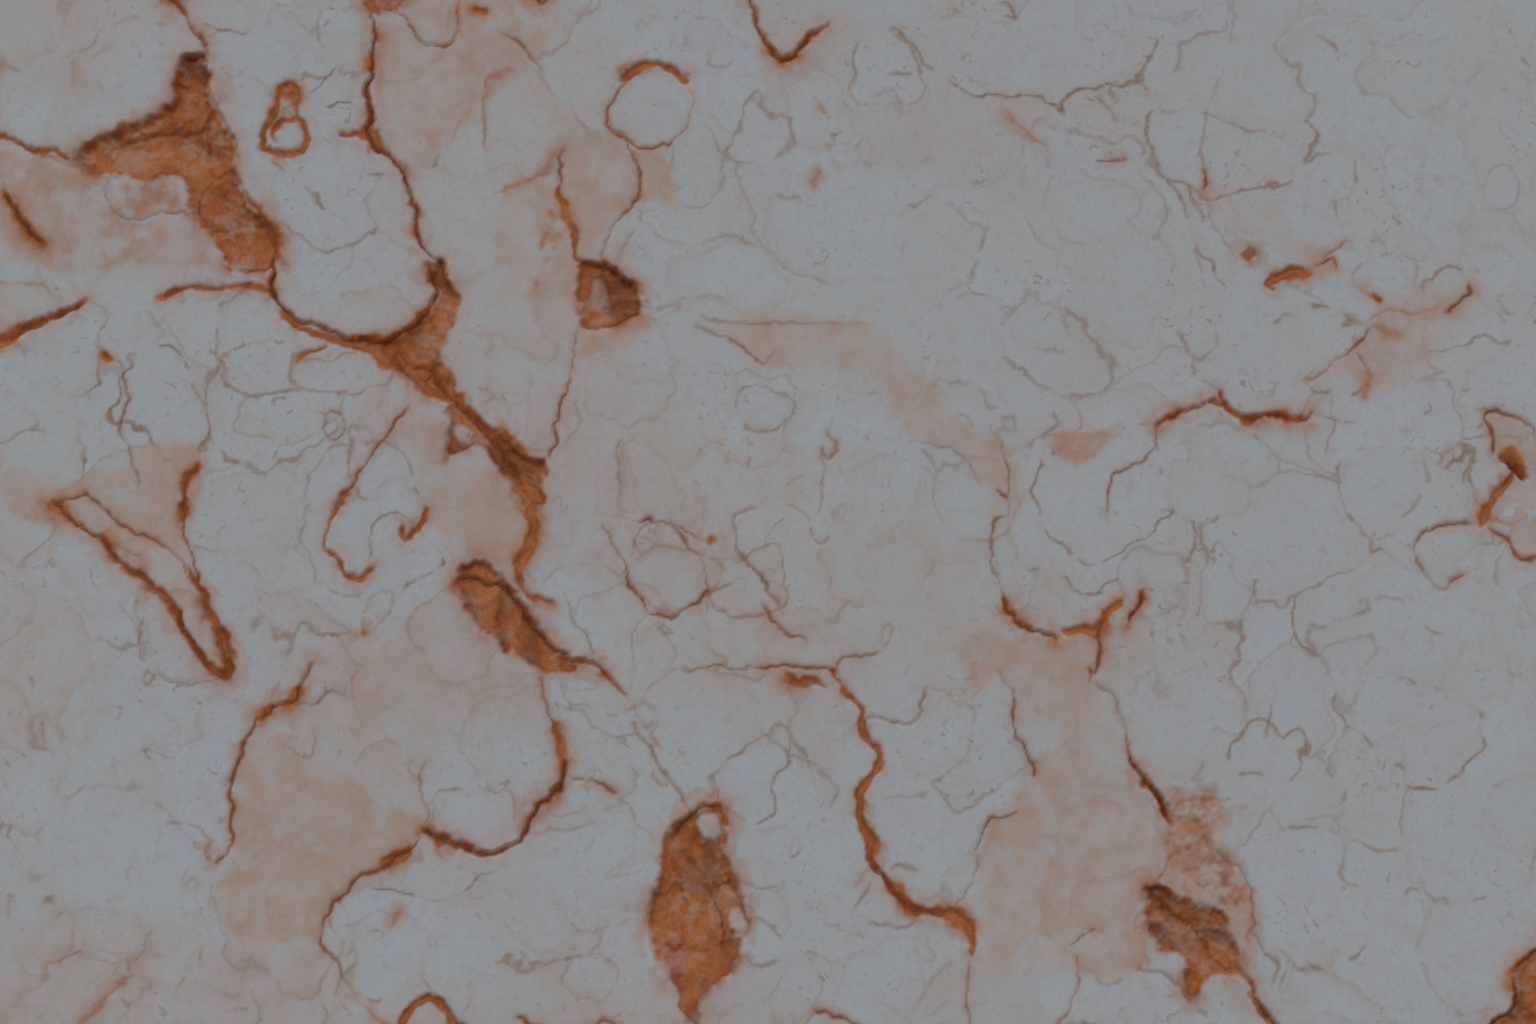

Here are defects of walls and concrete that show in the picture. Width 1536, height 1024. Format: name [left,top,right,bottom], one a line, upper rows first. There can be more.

spalling [58,32,306,290]
crack [59,0,702,280]
spalling [554,242,662,351]
crack [725,0,852,201]
crack [1102,0,1516,523]
crack [0,45,439,942]
spalling [434,538,583,680]
crack [312,413,1194,1024]
spalling [1466,394,1536,578]
spalling [631,783,761,1024]
spalling [1119,777,1265,1015]
crack [1134,960,1302,1024]